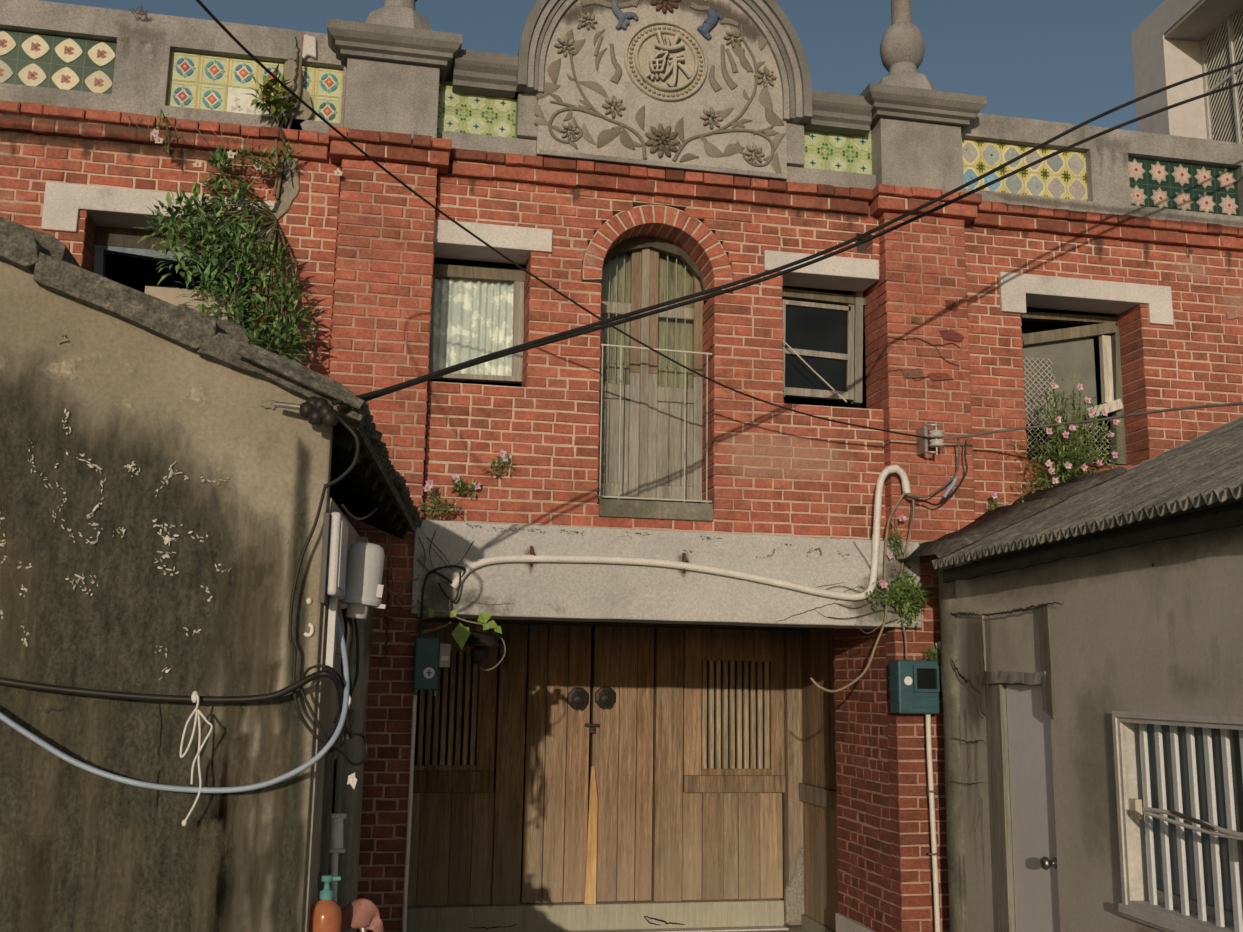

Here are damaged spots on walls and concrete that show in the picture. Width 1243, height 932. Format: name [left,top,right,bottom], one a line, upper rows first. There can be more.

damp [0,520,37,710]
peeling [28,440,126,544]
peeling [65,573,98,596]
peeling [152,519,208,576]
peeling [156,461,227,496]
crack [950,602,1062,616]
damp [27,697,58,932]
damp [79,697,142,932]
damp [196,536,292,932]
crack [950,659,990,830]